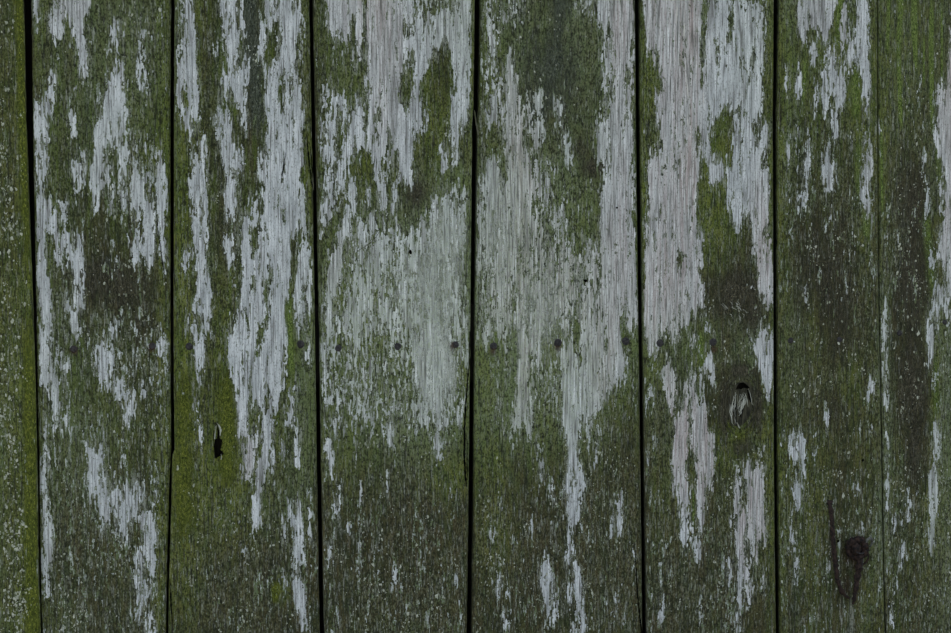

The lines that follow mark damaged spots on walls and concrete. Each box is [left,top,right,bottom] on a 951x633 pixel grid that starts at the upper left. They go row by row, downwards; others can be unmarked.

damp [851,70,860,117]
peeling [30,0,220,633]
damp [220,380,234,479]
peeling [201,0,951,633]
damp [900,176,934,320]
damp [899,353,937,413]